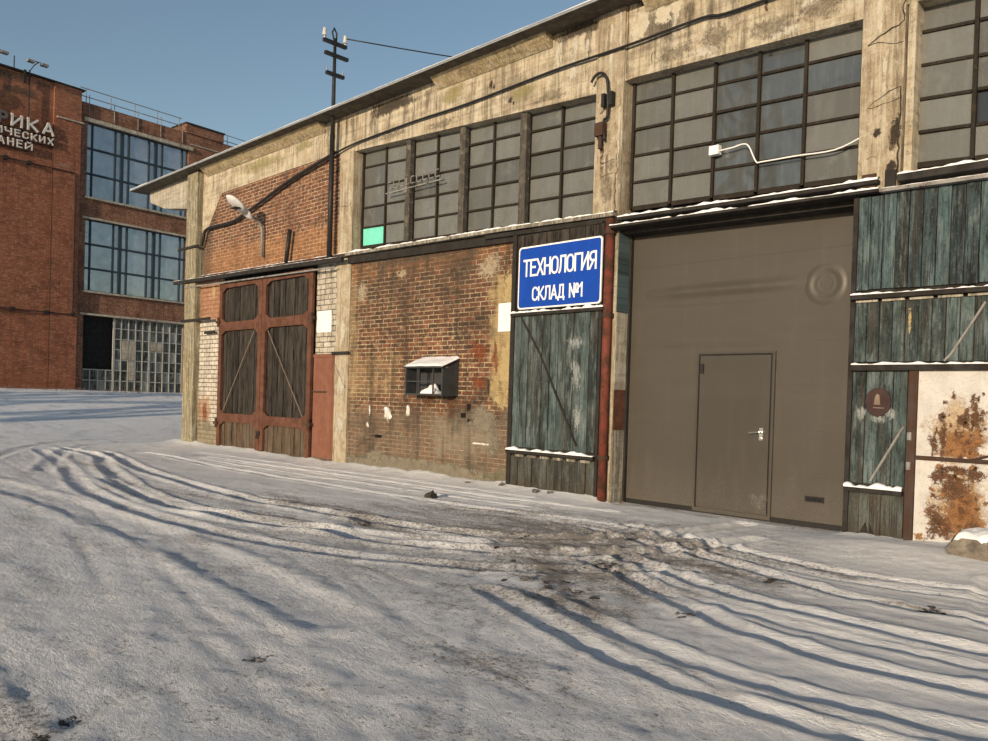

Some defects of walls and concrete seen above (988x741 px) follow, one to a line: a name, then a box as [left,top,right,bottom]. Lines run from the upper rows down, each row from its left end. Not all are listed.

peeling [629,0,735,62]
spalling [749,0,841,47]
crack [868,0,906,46]
corrosion [913,391,988,541]